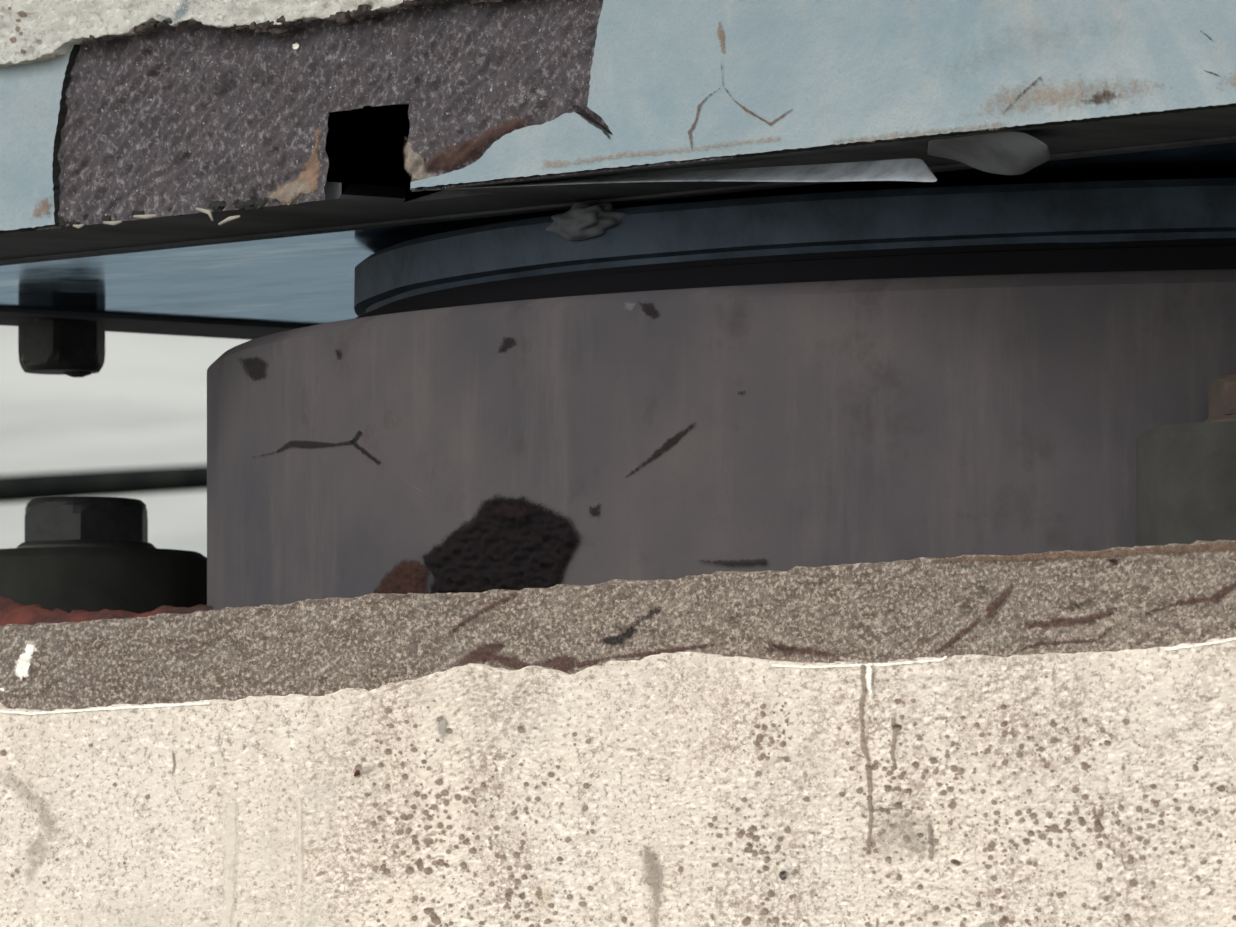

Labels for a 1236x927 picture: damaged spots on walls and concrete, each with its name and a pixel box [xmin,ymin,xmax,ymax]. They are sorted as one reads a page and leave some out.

peeling [31,0,1050,230]
crack [688,65,792,149]
crack [858,665,902,855]
crack [926,824,934,859]